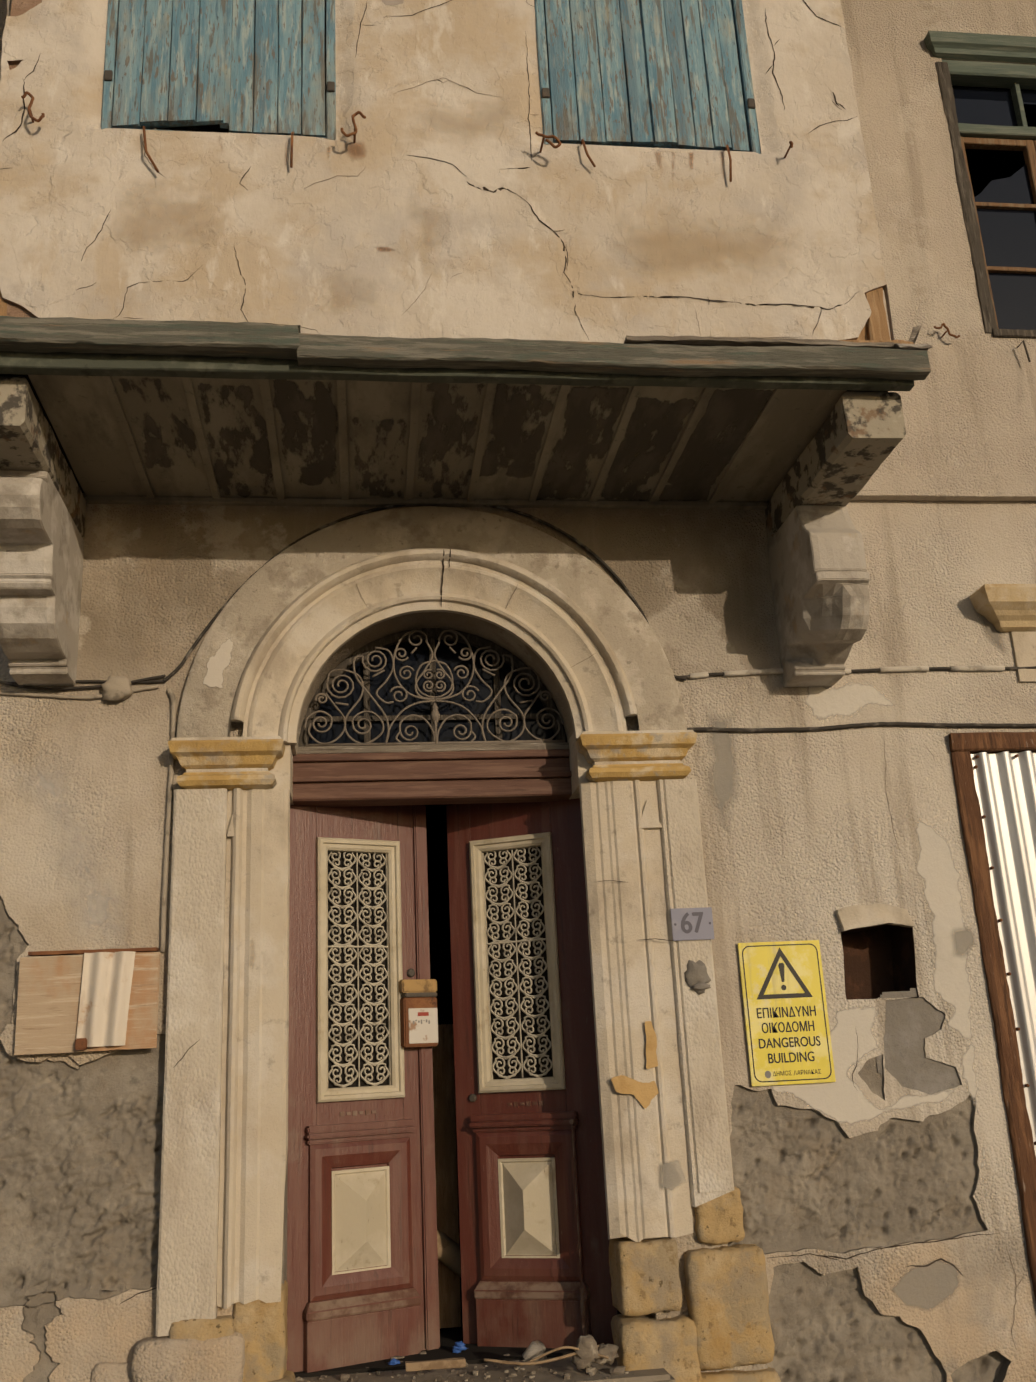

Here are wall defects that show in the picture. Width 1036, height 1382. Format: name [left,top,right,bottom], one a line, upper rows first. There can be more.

spalling [10,0,42,16]
crack [355,0,452,57]
crack [394,0,857,340]
peeling [119,378,772,501]
crack [440,549,451,607]
spalling [0,896,166,1382]
peeling [611,1021,659,1108]
peeling [662,1161,686,1189]
spalling [728,822,1005,1382]